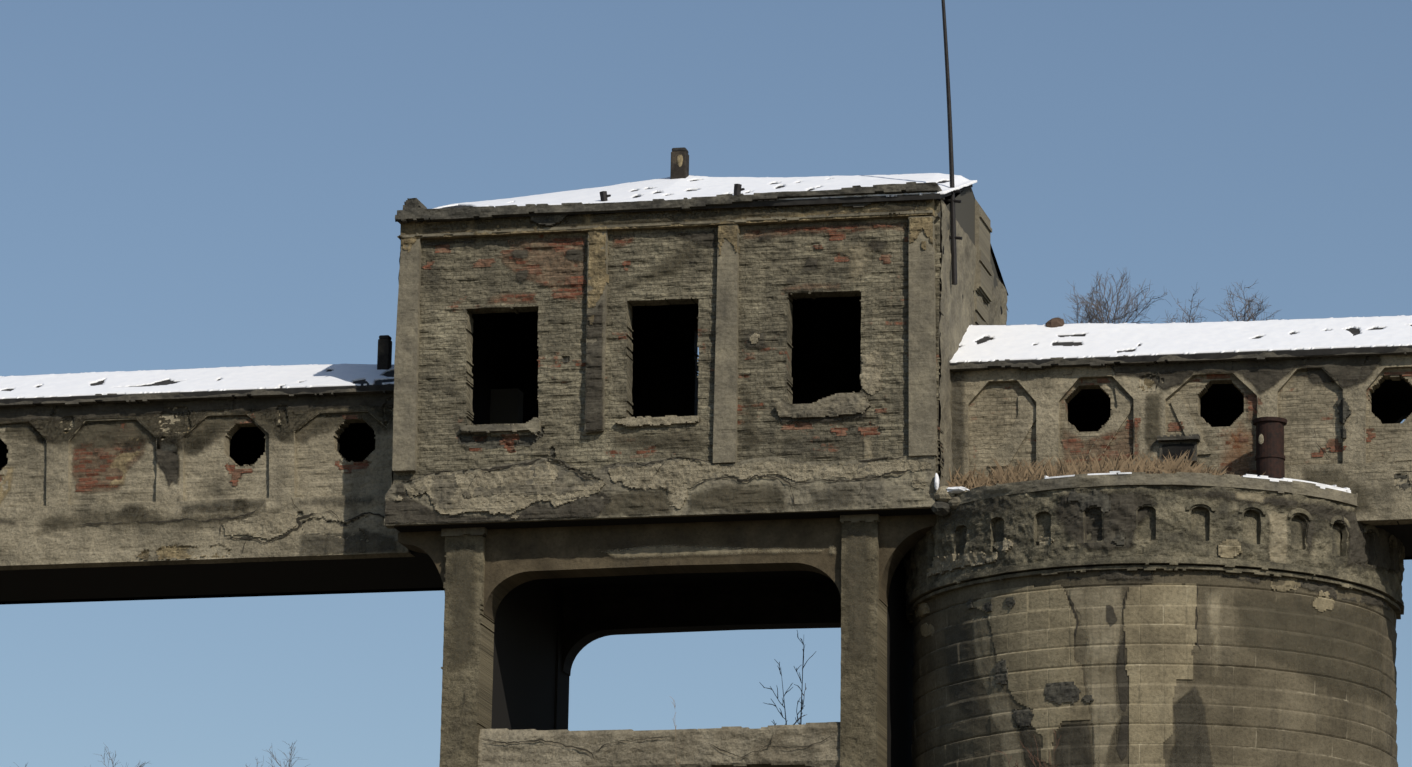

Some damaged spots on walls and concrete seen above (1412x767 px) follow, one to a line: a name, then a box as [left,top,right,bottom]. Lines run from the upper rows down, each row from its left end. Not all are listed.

flaking render [831,350,887,436]
flaking render [65,423,165,492]
flaking render [396,426,931,520]
damp [44,498,280,529]
crack [80,495,395,553]
spalling [927,538,1013,577]
damp [1184,471,1402,700]
damp [938,491,1156,767]
flaking render [1123,583,1197,767]
crack [482,736,668,763]
crack [708,735,833,758]
damp [1170,688,1213,767]